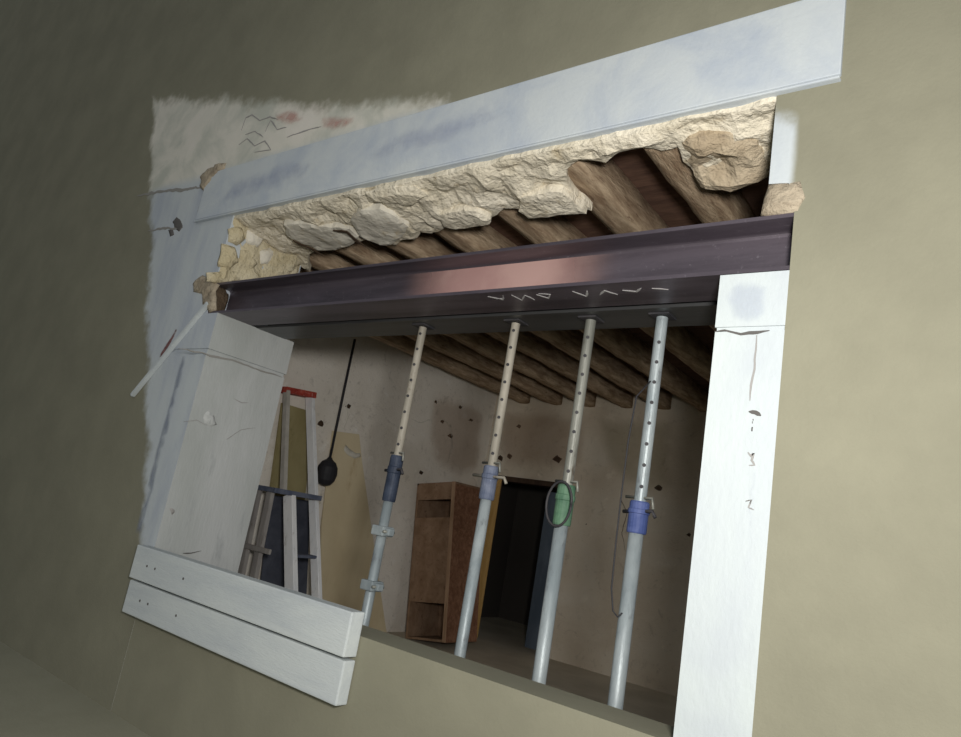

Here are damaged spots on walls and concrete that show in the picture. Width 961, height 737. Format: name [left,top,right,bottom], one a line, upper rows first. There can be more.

spalling [234,97,777,271]
spalling [761,181,805,216]
crack [715,329,770,399]